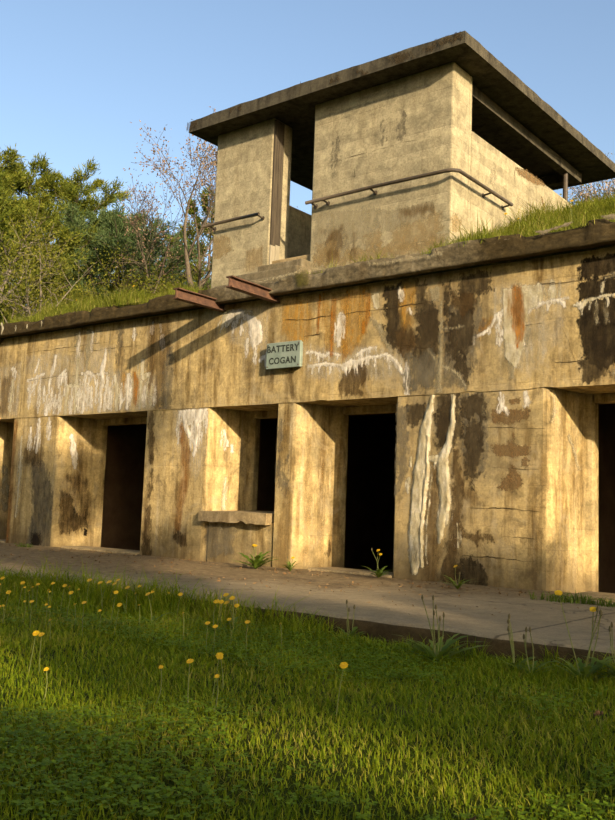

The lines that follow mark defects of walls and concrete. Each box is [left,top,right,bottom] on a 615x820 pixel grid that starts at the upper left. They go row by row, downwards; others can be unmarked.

rust [282,288,370,356]
rust [503,283,540,367]
water stain [573,252,615,384]
water stain [0,366,17,413]
water stain [15,316,174,556]
rust [176,425,190,531]
water stain [176,408,208,457]
water stain [306,267,508,586]
water stain [173,531,187,547]